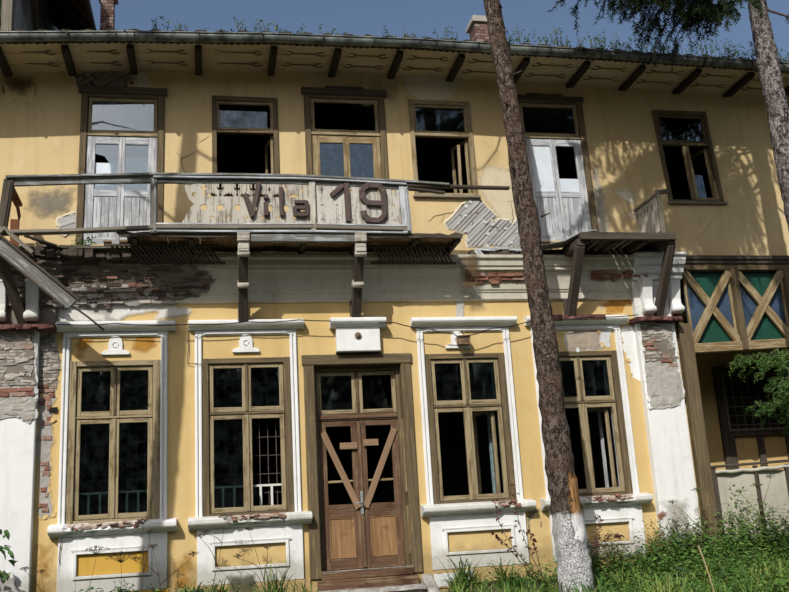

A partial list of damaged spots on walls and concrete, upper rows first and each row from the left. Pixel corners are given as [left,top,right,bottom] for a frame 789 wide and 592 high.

water stain [31,191,70,215]
flaking render [9,264,28,303]
flaking render [31,256,218,322]
flaking render [475,272,524,284]
flaking render [590,270,648,281]
flaking render [564,322,685,409]
flaking render [0,330,62,521]